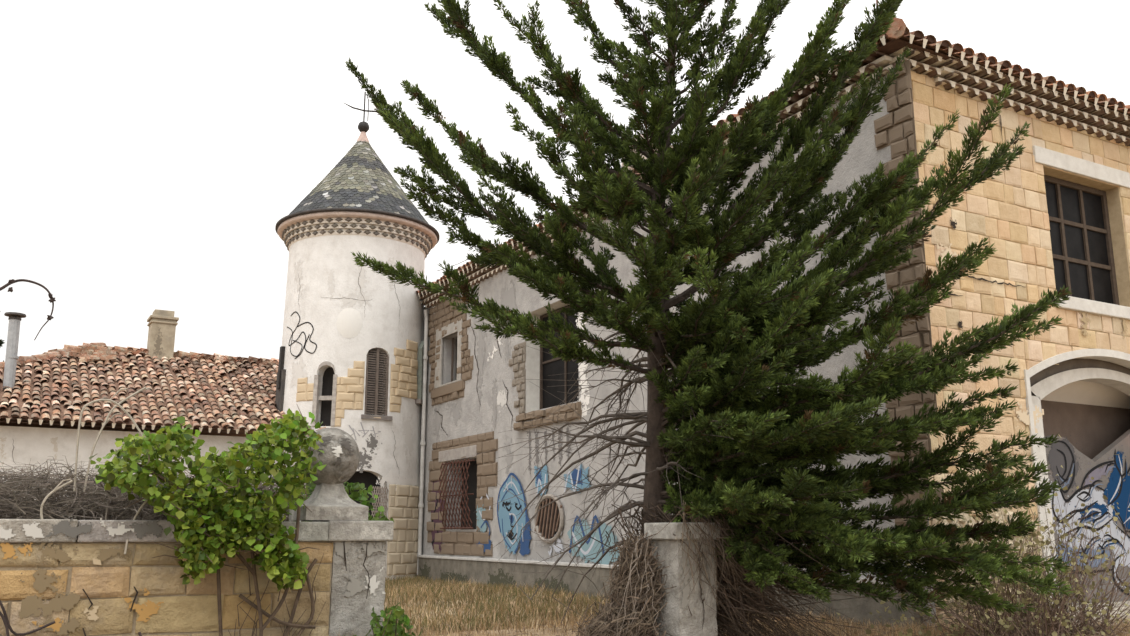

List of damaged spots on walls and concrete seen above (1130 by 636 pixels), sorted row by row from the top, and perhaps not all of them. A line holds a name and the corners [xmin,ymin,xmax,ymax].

flaking render [318,294,526,465]
spalling [84,606,99,621]